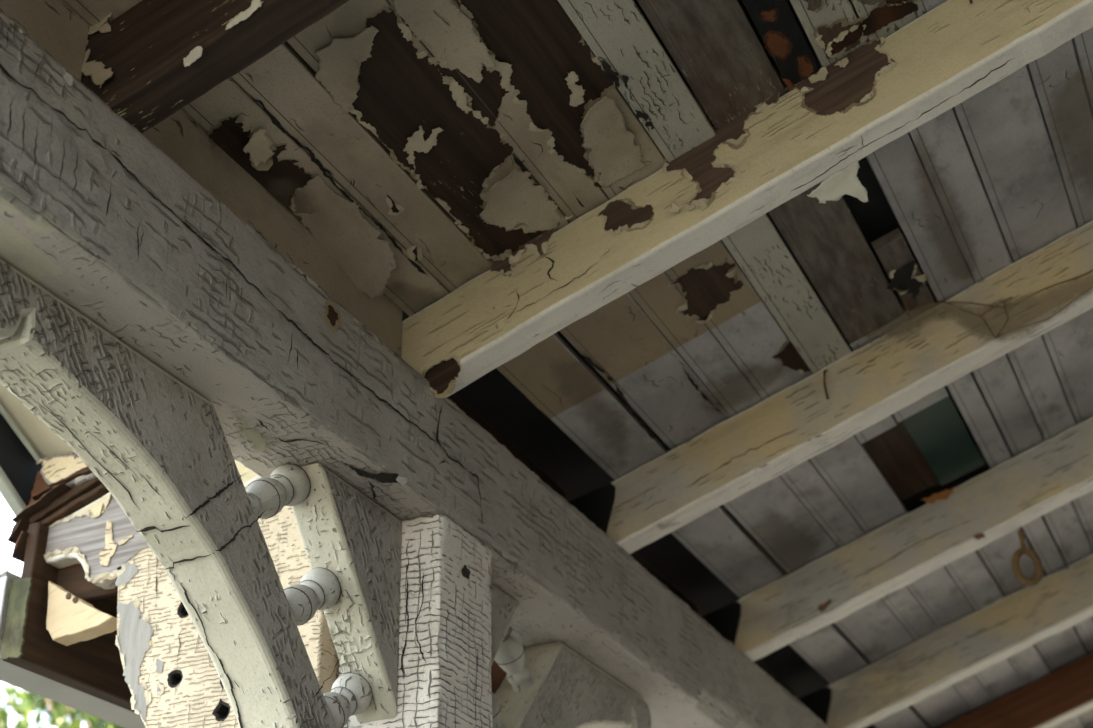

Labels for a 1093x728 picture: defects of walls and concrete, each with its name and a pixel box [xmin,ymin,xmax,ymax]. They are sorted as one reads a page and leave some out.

peeling [183,46,203,67]
peeling [225,0,263,30]
peeling [315,0,918,279]
peeling [206,112,422,300]
crack [0,26,484,522]
peeling [44,493,148,589]
peeling [115,597,153,721]
crack [153,557,243,728]
crack [401,559,432,678]
crack [472,652,480,720]